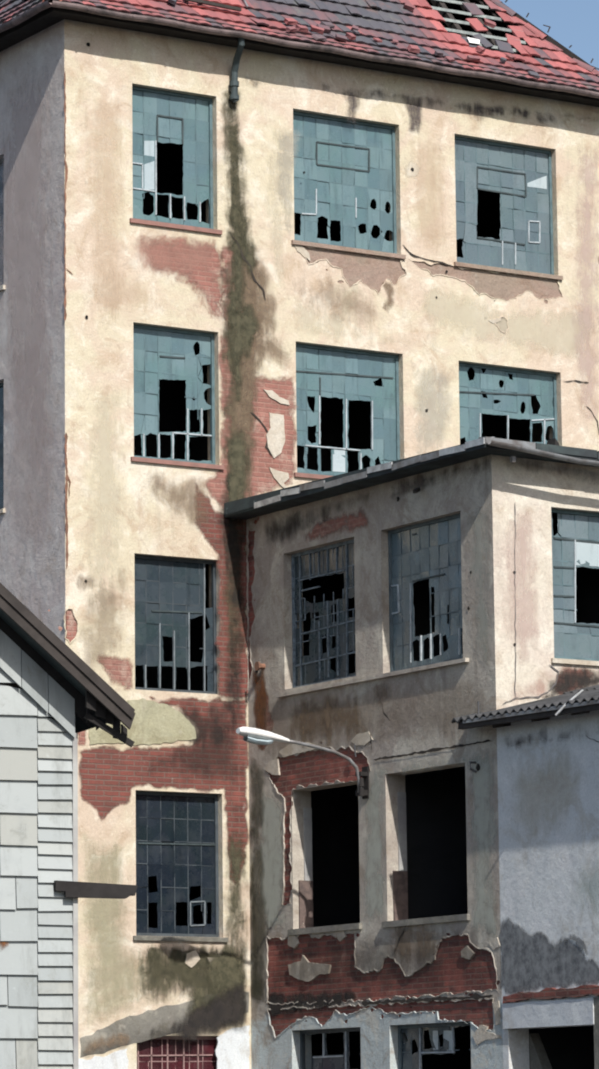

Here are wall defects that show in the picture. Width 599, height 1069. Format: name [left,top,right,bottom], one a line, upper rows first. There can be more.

leakage [228,127,282,502]
peeling [294,245,563,304]
spalling [243,377,297,498]
spalling [78,237,259,883]
leakage [223,517,241,604]
spalling [308,510,368,539]
spalling [265,731,373,906]
leakage [144,948,221,996]
spalling [266,923,502,1045]